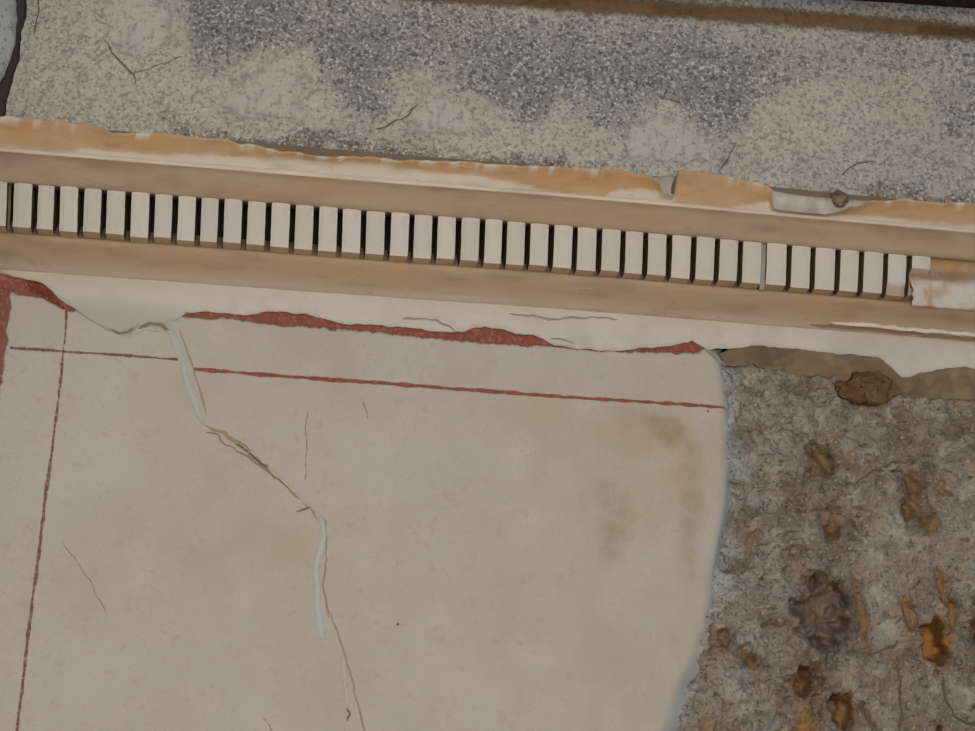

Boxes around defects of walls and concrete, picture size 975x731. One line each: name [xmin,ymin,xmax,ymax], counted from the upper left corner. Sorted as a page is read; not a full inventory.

crack [104,39,182,84]
spalling [909,259,975,312]
crack [165,322,365,731]
spalling [676,345,975,731]